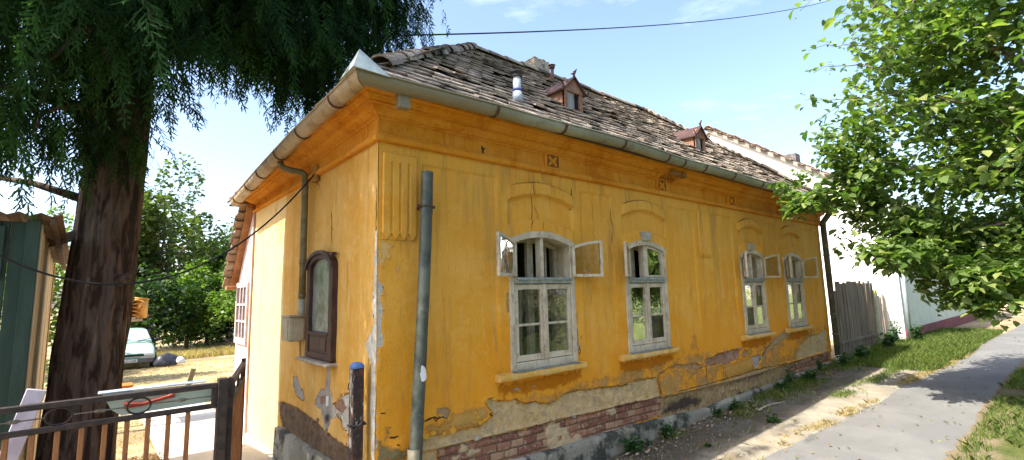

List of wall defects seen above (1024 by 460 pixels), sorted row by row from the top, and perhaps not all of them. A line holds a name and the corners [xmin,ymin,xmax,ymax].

crack [513,173,657,247]
spalling [366,188,400,460]
spalling [279,367,349,460]
spalling [422,326,829,460]